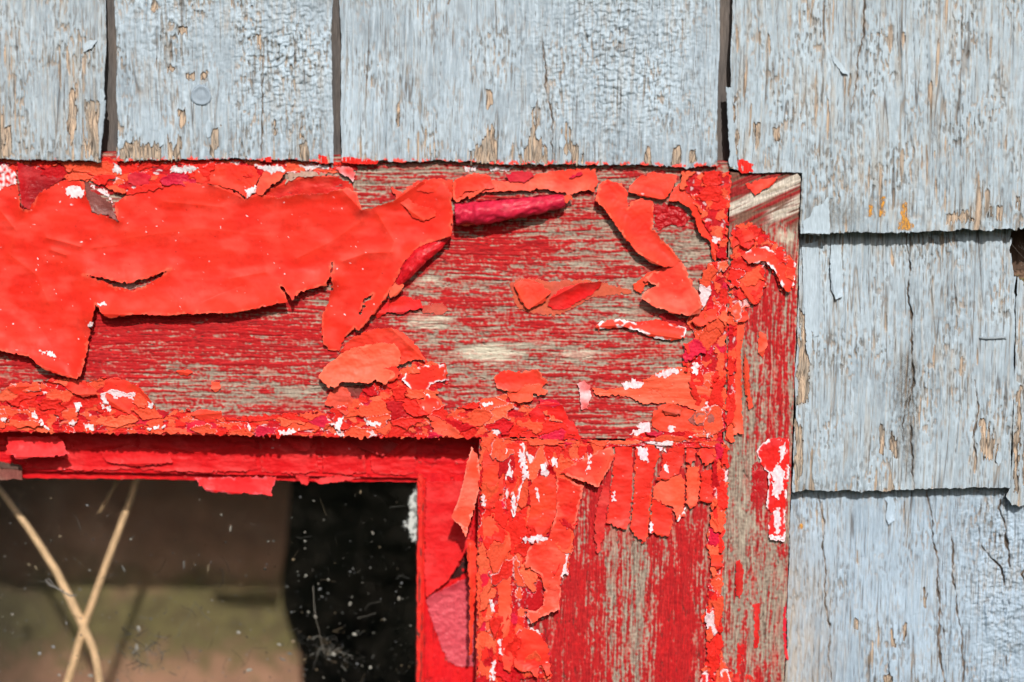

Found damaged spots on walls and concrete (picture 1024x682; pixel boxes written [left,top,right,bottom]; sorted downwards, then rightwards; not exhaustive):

peeling [0,83,843,682]
crack [902,238,965,682]
crack [990,500,1024,585]